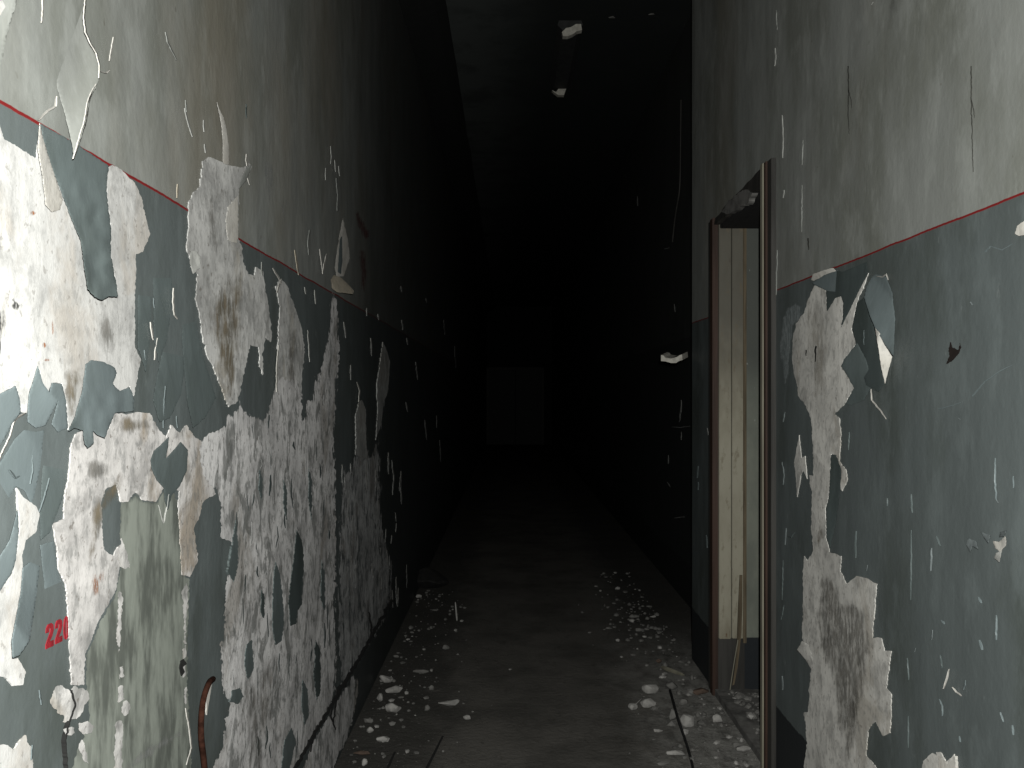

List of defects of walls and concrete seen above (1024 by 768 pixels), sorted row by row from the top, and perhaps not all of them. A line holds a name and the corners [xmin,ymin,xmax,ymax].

crack [845,66,853,131]
crack [968,66,976,172]
peeling [0,104,408,768]
peeling [782,262,895,768]